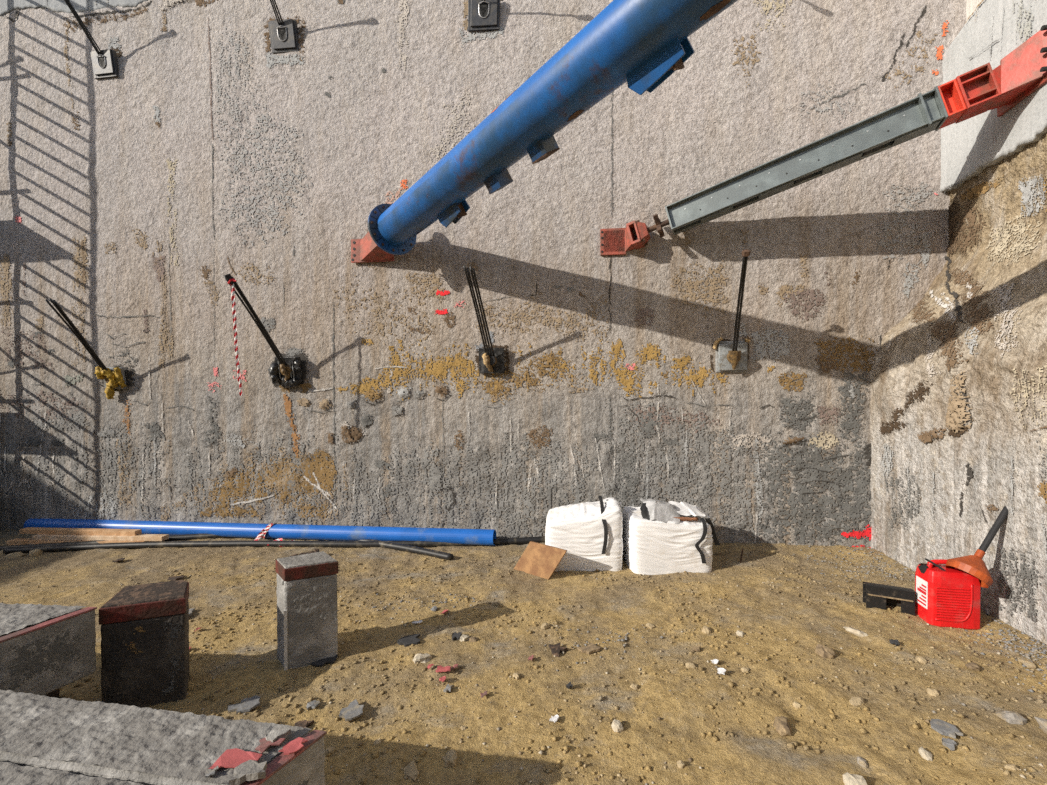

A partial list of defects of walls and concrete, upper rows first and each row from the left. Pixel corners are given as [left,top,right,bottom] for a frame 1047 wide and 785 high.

crack [820,6,926,105]